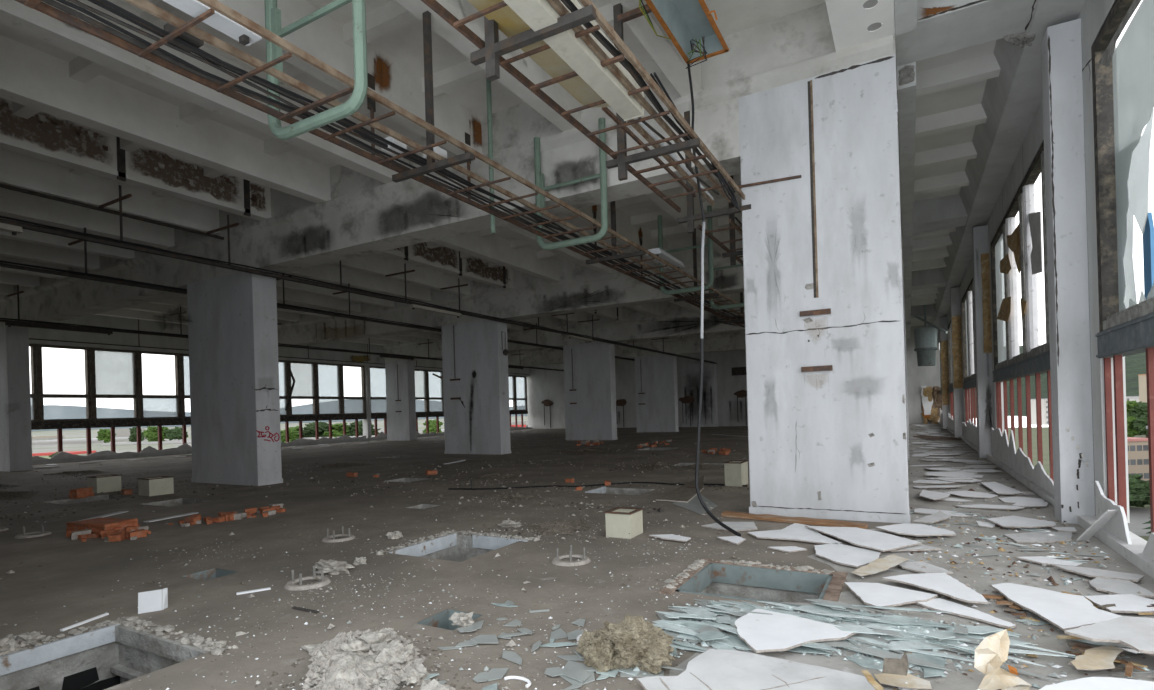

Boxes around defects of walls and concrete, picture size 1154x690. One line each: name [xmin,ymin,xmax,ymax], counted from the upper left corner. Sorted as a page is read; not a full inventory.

crack [919,0,986,20]
peeling [0,100,108,163]
peeling [133,148,266,210]
crack [1025,0,1059,366]
crack [746,311,897,335]